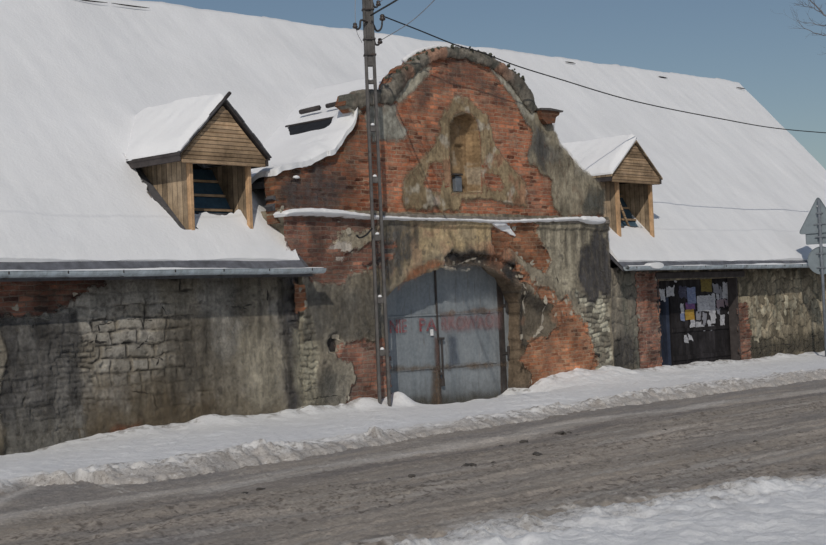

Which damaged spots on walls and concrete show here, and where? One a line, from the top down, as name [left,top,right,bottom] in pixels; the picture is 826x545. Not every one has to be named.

flaking render [0,280,107,318]
flaking render [280,206,397,314]
flaking render [444,222,600,389]
leakage [579,223,612,304]
flaking render [327,334,392,403]